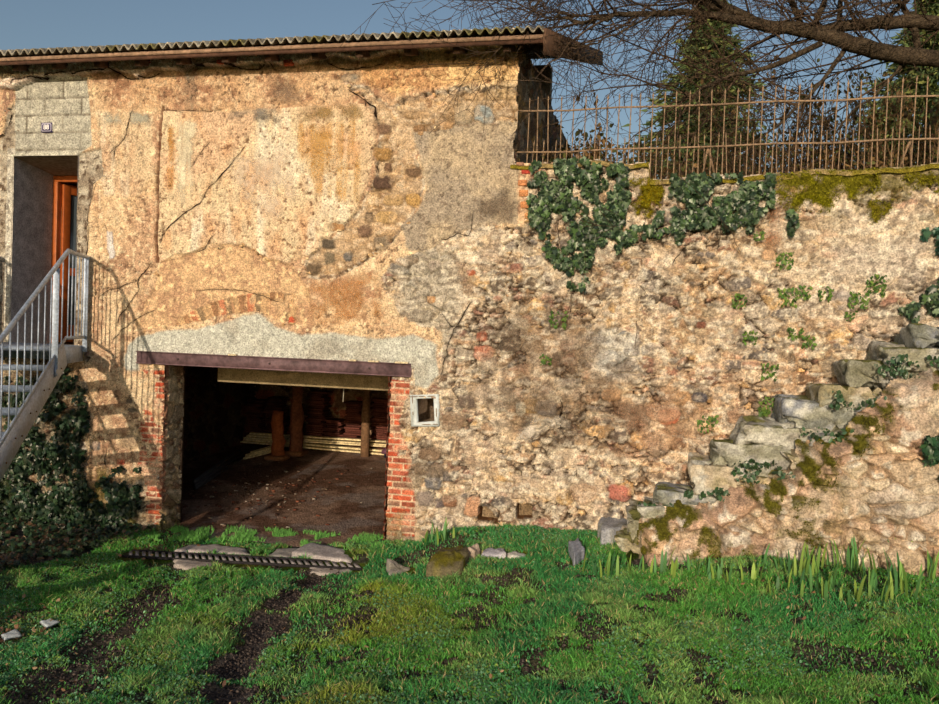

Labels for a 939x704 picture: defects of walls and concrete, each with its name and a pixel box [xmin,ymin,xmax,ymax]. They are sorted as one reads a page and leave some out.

crack [9,67,160,85]
crack [100,104,245,340]
peeling [135,80,519,332]
crack [328,63,385,119]